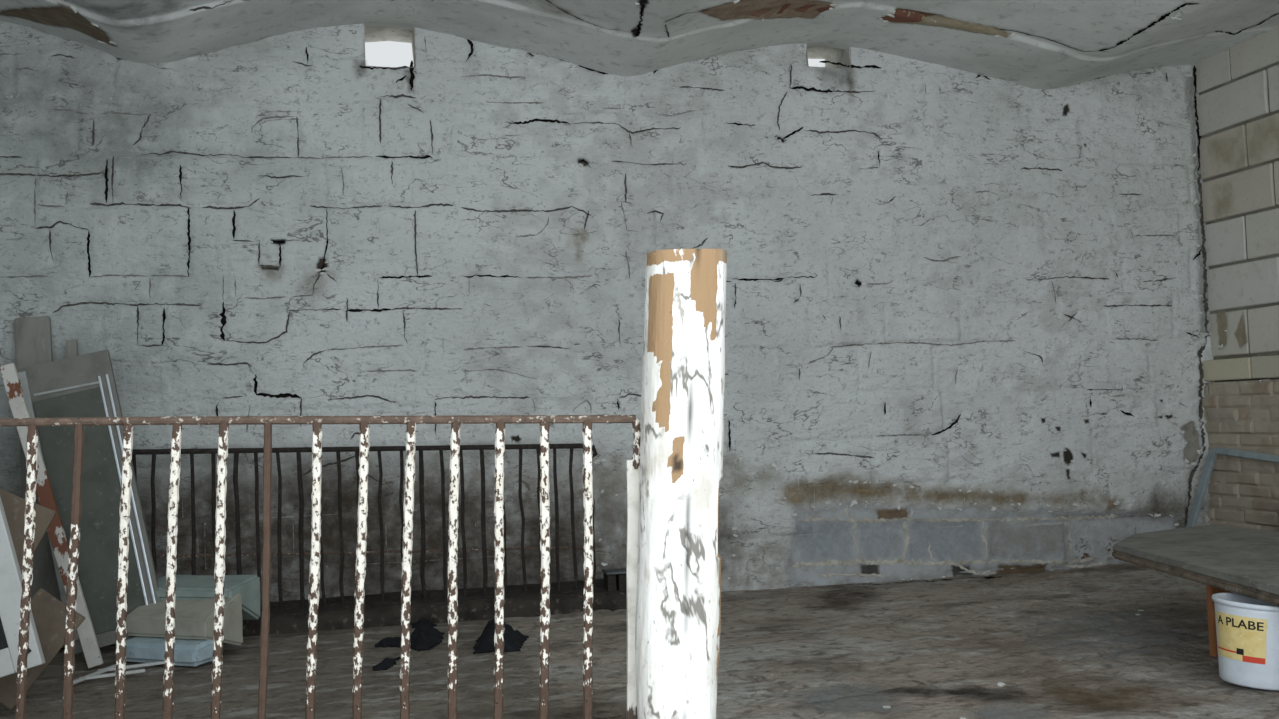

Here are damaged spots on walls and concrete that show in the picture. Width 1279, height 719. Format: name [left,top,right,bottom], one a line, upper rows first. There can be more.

crack [190,0,247,11]
crack [546,0,712,38]
spalling [700,0,837,21]
spalling [878,8,1015,38]
crack [1215,13,1279,35]
crack [725,61,882,204]
crack [0,38,724,433]
crack [923,255,959,263]
crack [993,3,1210,526]
crack [726,276,1043,384]
crack [815,403,961,458]
crack [302,432,383,485]